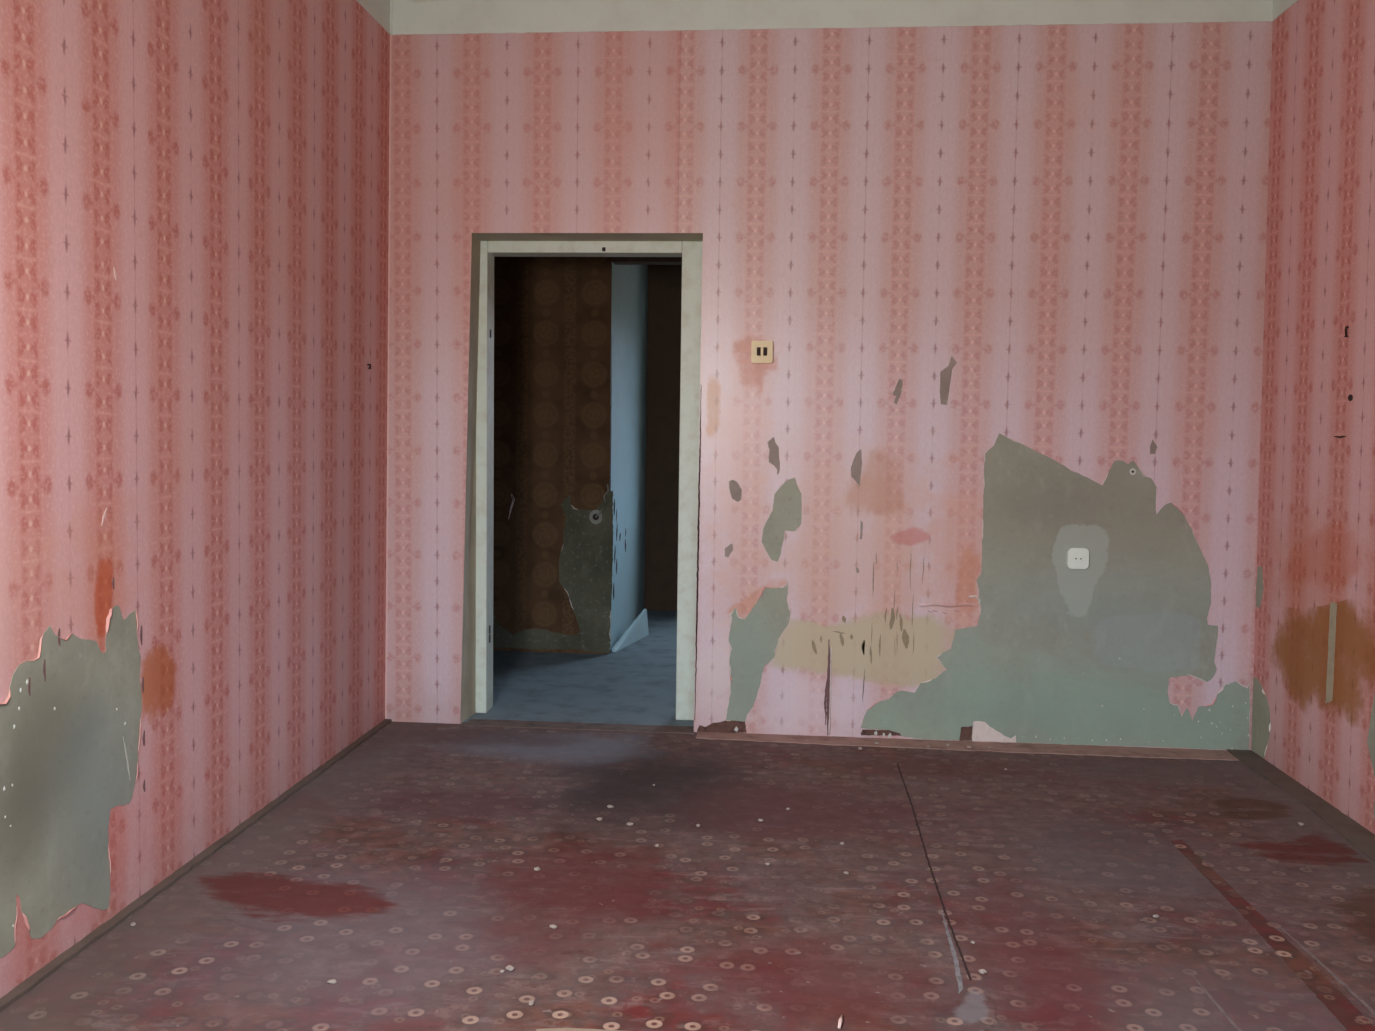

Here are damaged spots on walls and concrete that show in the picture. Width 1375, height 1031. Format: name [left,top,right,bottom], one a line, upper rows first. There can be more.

peeling [0,577,145,959]
peeling [493,490,626,654]
peeling [697,583,792,733]
peeling [762,477,802,562]
peeling [861,433,1271,758]
leakage [1255,510,1375,747]
peeling [1367,686,1375,781]